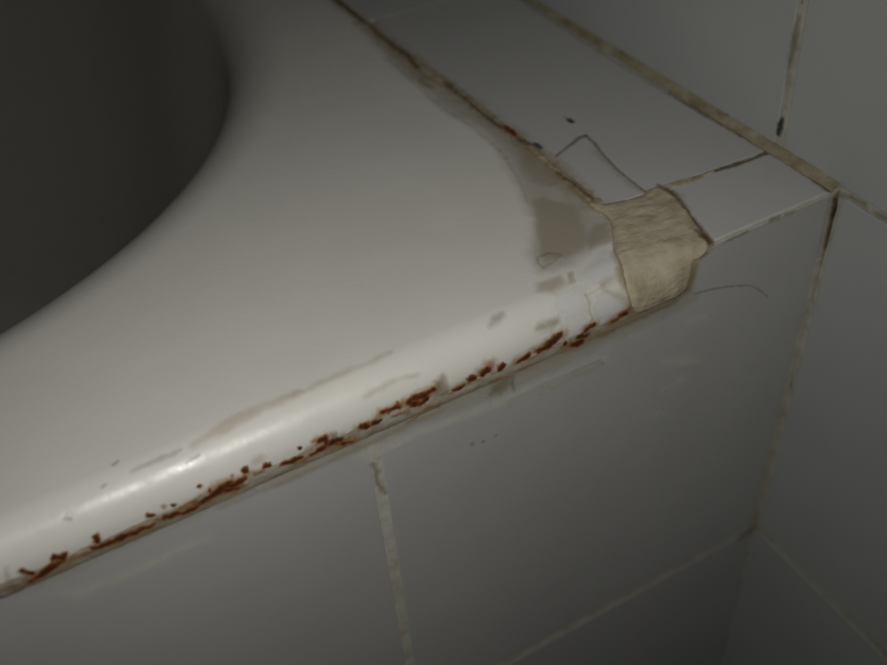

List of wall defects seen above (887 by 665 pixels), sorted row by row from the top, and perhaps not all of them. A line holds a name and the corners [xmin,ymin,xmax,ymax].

damp [372,27,542,155]
crack [556,134,647,193]
rust [452,306,630,392]
rust [358,386,440,430]
rust [18,434,355,584]